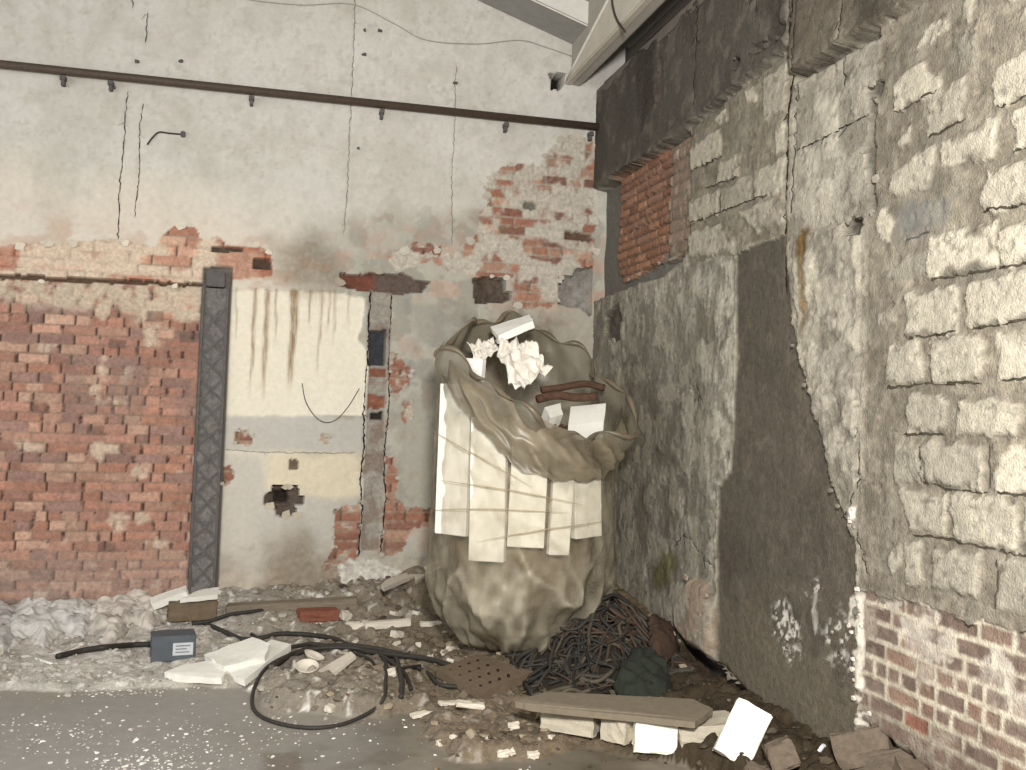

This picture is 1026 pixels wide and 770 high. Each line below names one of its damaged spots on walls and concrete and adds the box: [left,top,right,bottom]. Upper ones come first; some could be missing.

crack [781,0,868,291]
flaking render [0,222,274,288]
flaking render [374,130,601,310]
corrosion [797,229,809,319]
flaking render [368,329,416,423]
spalling [265,484,305,520]
flaking render [321,501,363,583]
flaking render [373,453,436,577]
flaking render [677,234,1026,770]
crack [841,432,868,574]
leakage [773,601,800,661]
leakage [812,585,848,659]